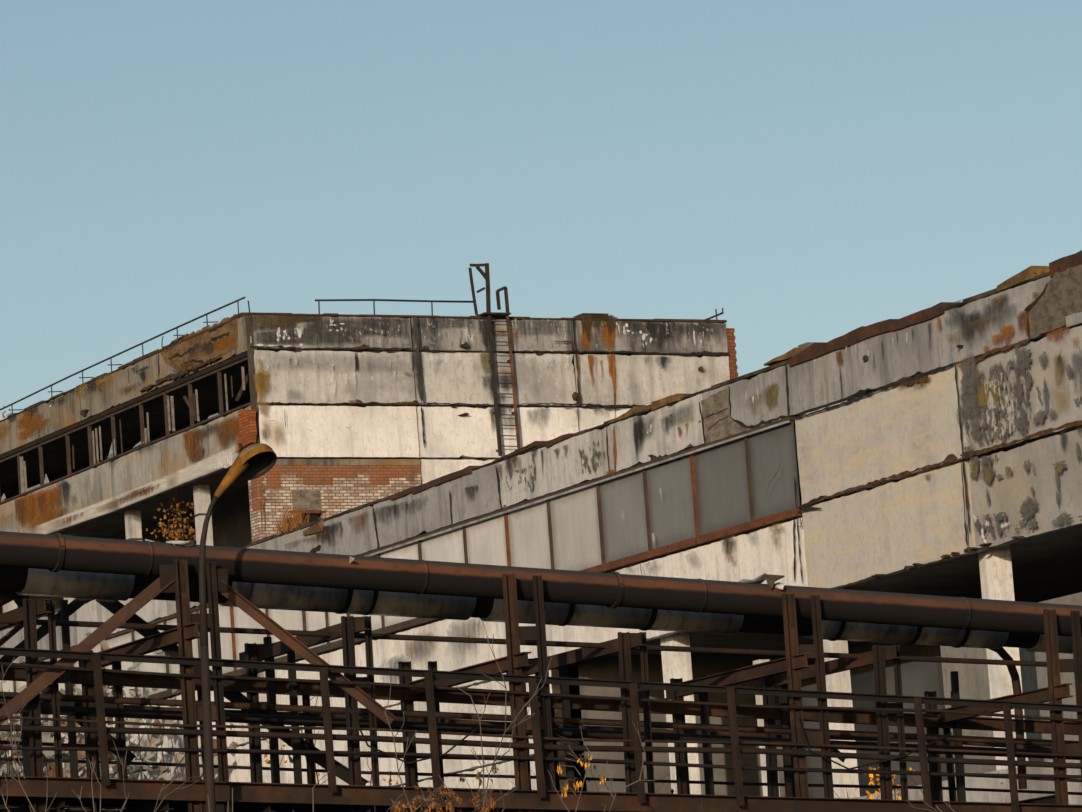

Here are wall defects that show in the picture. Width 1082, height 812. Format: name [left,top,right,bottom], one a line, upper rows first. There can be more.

damp [253,315,420,391]
damp [478,316,512,391]
rust [581,315,617,414]
rust [184,429,202,461]
damp [634,422,652,452]
spalling [701,386,788,443]
peeling [941,345,1082,559]
rust [15,484,64,526]